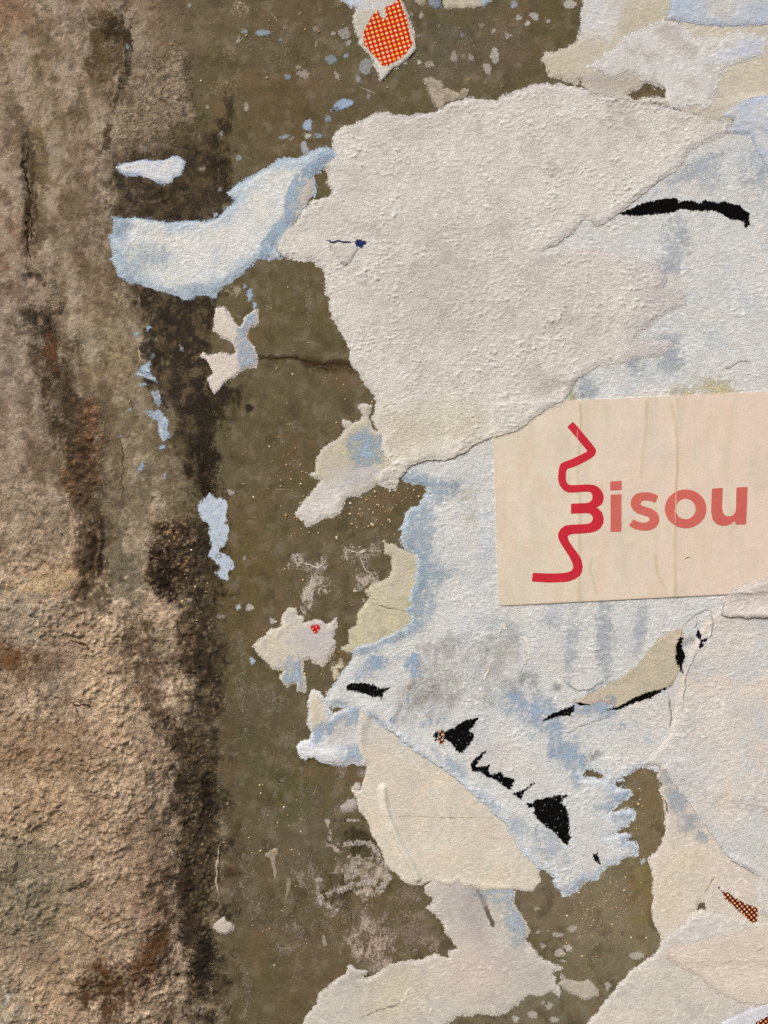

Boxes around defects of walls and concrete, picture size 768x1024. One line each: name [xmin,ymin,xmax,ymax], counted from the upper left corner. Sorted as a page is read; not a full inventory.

spalling [107,39,202,150]
crack [20,137,33,267]
damp [22,283,446,1024]
spalling [138,509,228,1007]
peeling [314,840,392,912]